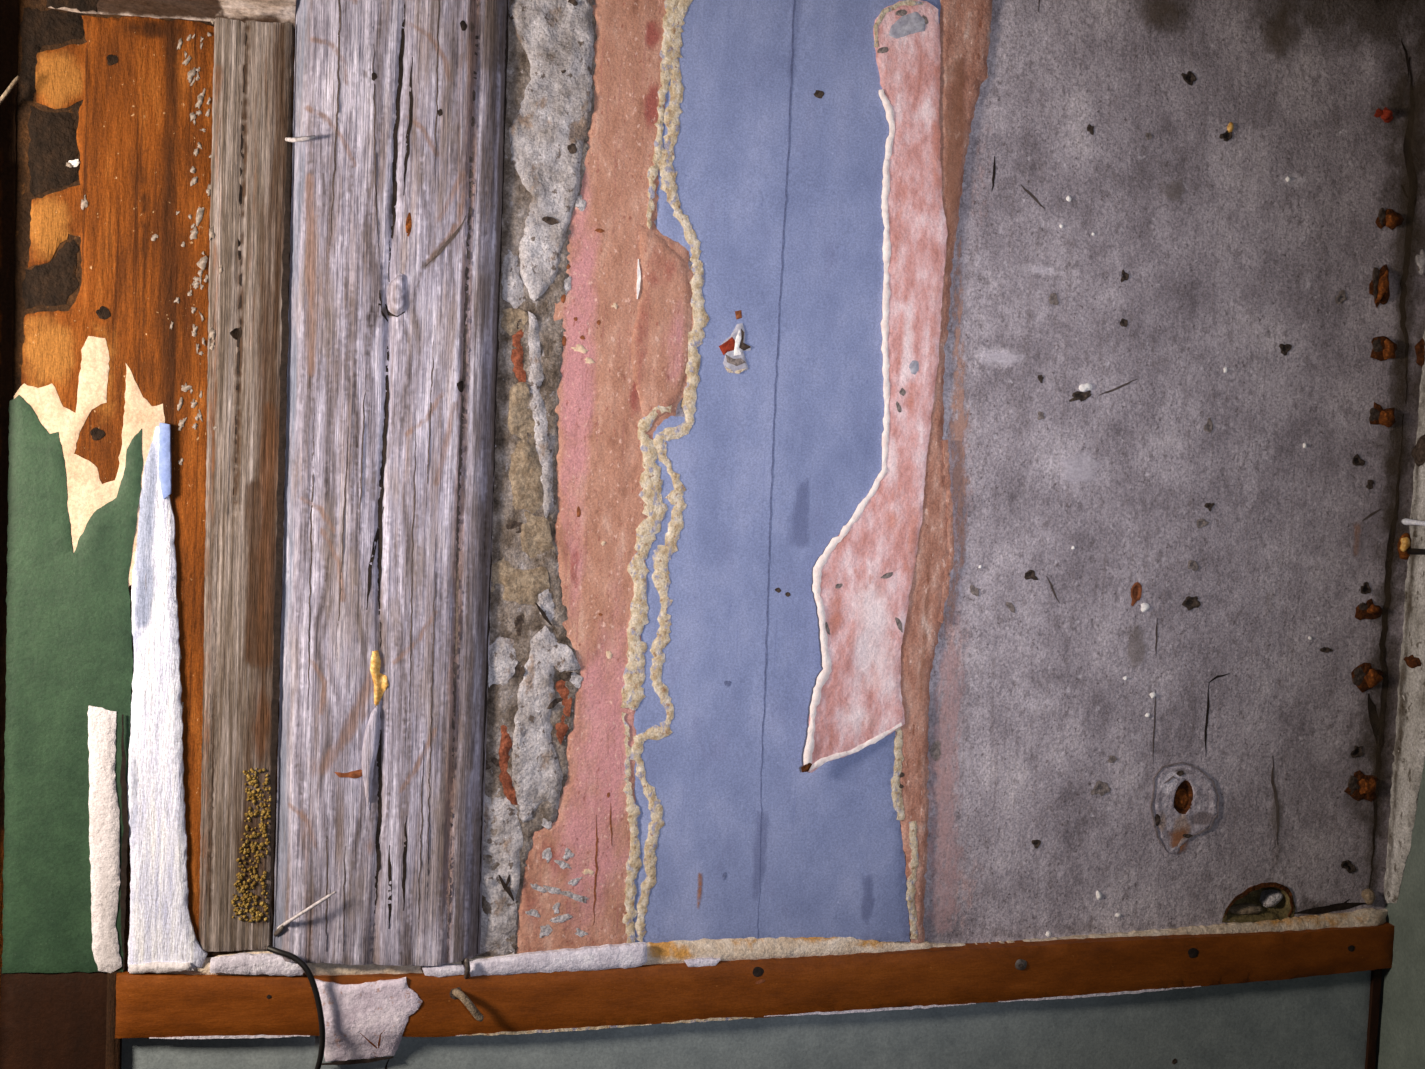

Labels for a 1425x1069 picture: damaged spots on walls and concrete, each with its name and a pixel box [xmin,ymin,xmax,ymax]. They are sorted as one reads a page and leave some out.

peeling [2,15,222,973]
crack [233,32,246,495]
crack [269,0,514,954]
spalling [478,0,597,957]
peeling [606,0,751,943]
peeling [801,0,955,940]